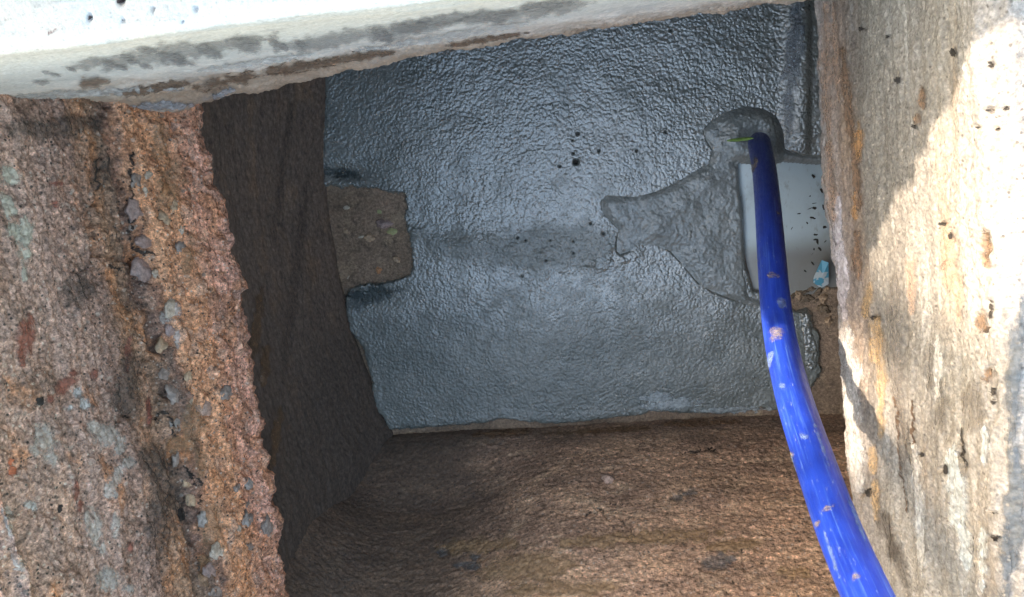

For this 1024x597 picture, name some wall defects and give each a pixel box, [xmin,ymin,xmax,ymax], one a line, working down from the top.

damp [17,1,587,99]